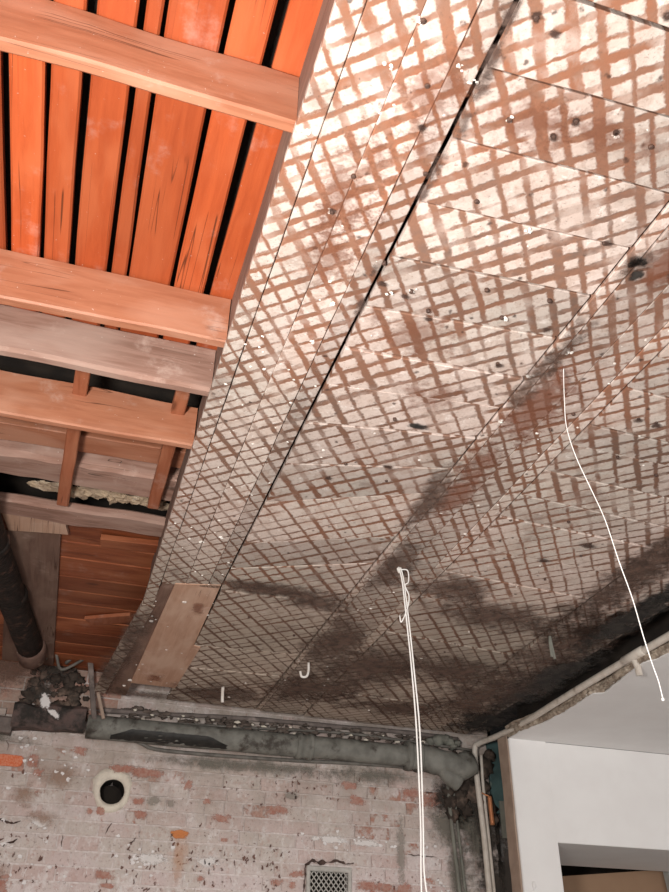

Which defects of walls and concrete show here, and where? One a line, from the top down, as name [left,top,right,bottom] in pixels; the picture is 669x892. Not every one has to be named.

leakage [511,323,583,408]
leakage [404,475,453,530]
leakage [186,541,669,734]
spalling [505,641,669,737]
peeling [0,737,86,790]
spalling [84,765,164,819]
crack [0,818,20,846]
peeling [0,827,73,892]
peeling [77,834,304,892]